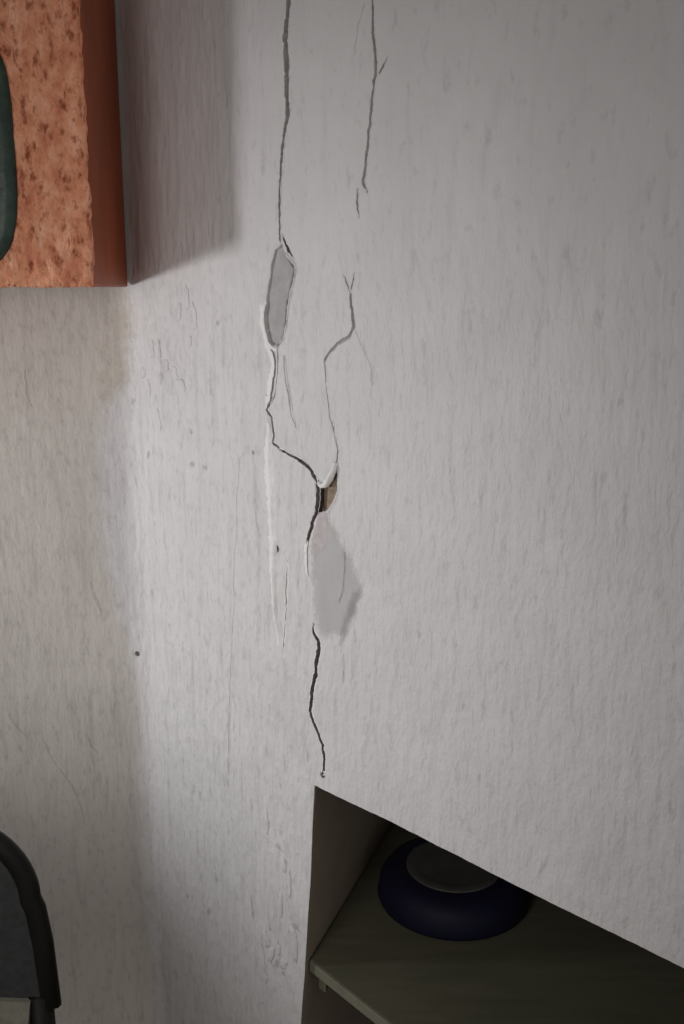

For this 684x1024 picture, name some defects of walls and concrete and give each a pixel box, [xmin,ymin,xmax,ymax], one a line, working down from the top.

crack [277,0,296,263]
crack [354,0,388,217]
crack [323,273,374,385]
flaking render [259,243,357,633]
crack [281,561,289,659]
crack [305,625,326,780]